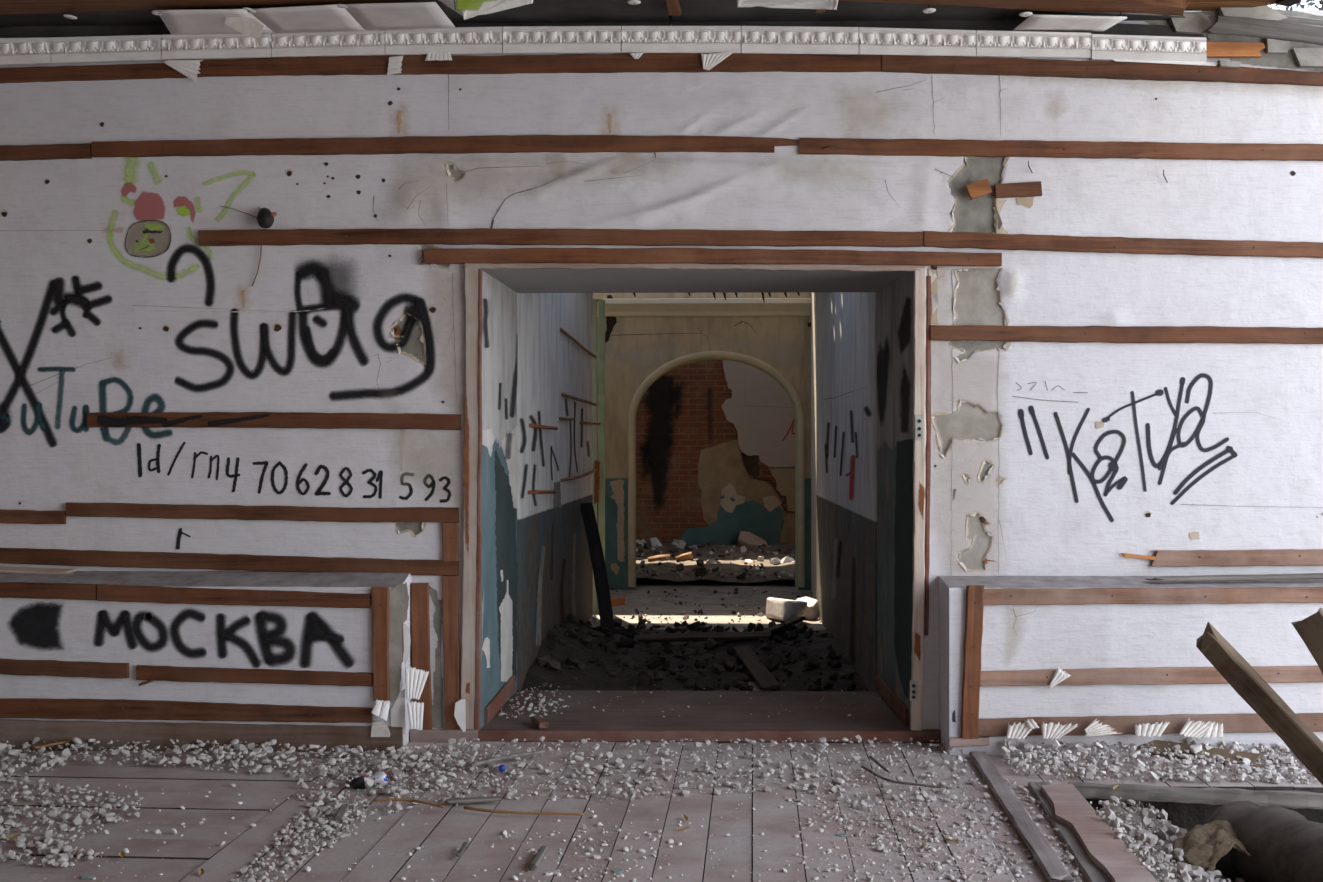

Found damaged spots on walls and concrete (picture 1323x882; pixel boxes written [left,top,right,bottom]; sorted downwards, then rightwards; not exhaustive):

flaking render [948,156,1034,234]
flaking render [928,267,1011,363]
spalling [741,452,760,477]
flaking render [931,399,1003,459]
flaking render [962,460,1005,487]
peeling [464,397,518,682]
flaking render [958,511,994,571]
peeling [389,583,411,735]